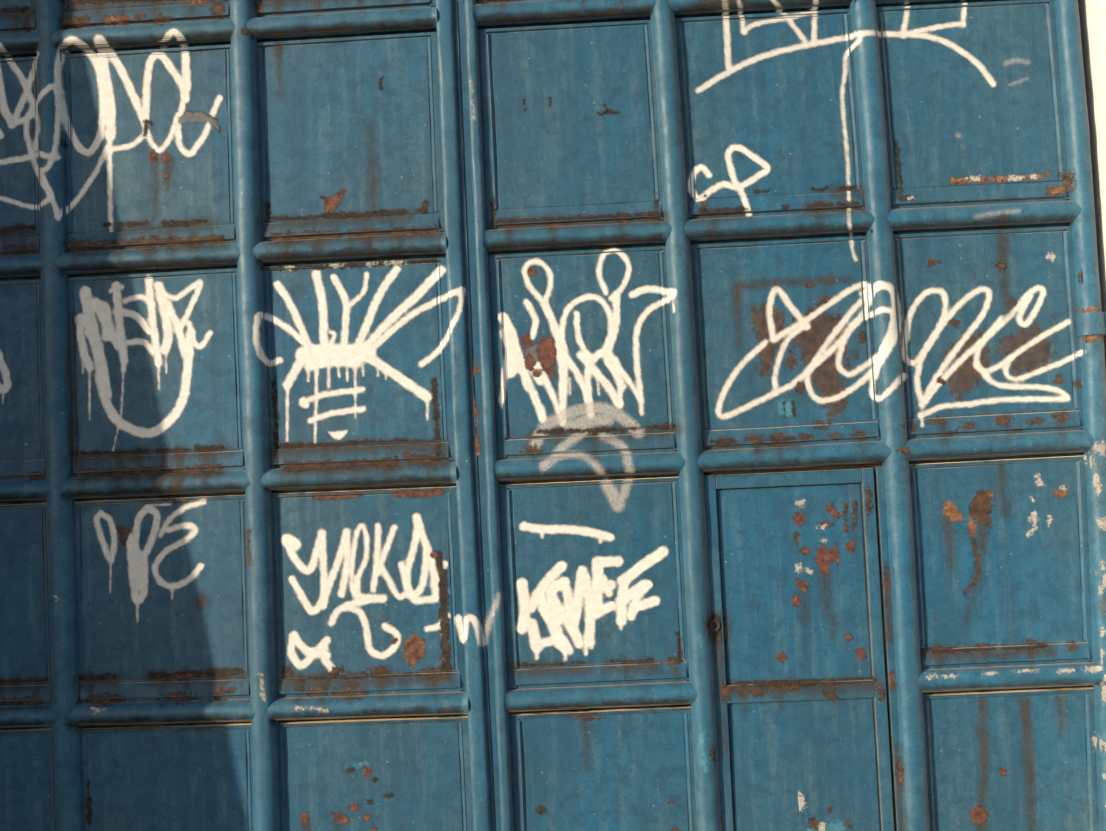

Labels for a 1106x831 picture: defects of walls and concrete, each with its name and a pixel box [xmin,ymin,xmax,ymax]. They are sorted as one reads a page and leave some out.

corrosion [58,0,226,29]
corrosion [894,141,913,201]
corrosion [950,169,1076,196]
corrosion [265,200,440,244]
peeling [1084,440,1106,493]
peeling [1025,473,1068,537]
peeling [1090,561,1106,614]
corrosion [281,551,452,713]
corrosion [75,672,126,715]
corrosion [148,667,244,705]